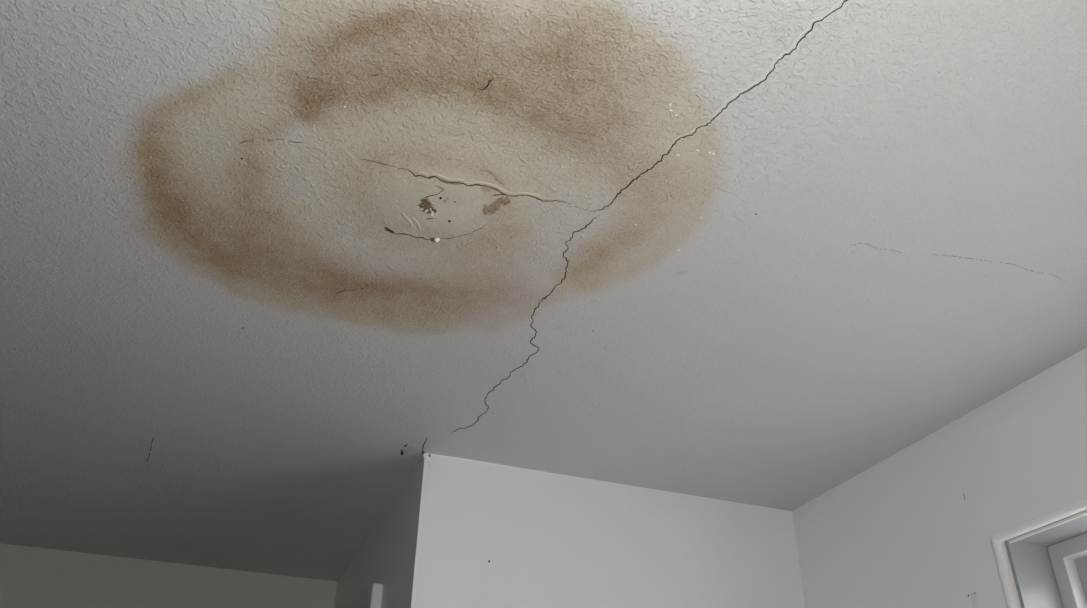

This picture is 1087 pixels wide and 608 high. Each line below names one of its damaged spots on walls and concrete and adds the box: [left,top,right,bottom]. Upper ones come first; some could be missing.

leakage [89,0,737,352]
crack [361,0,848,451]